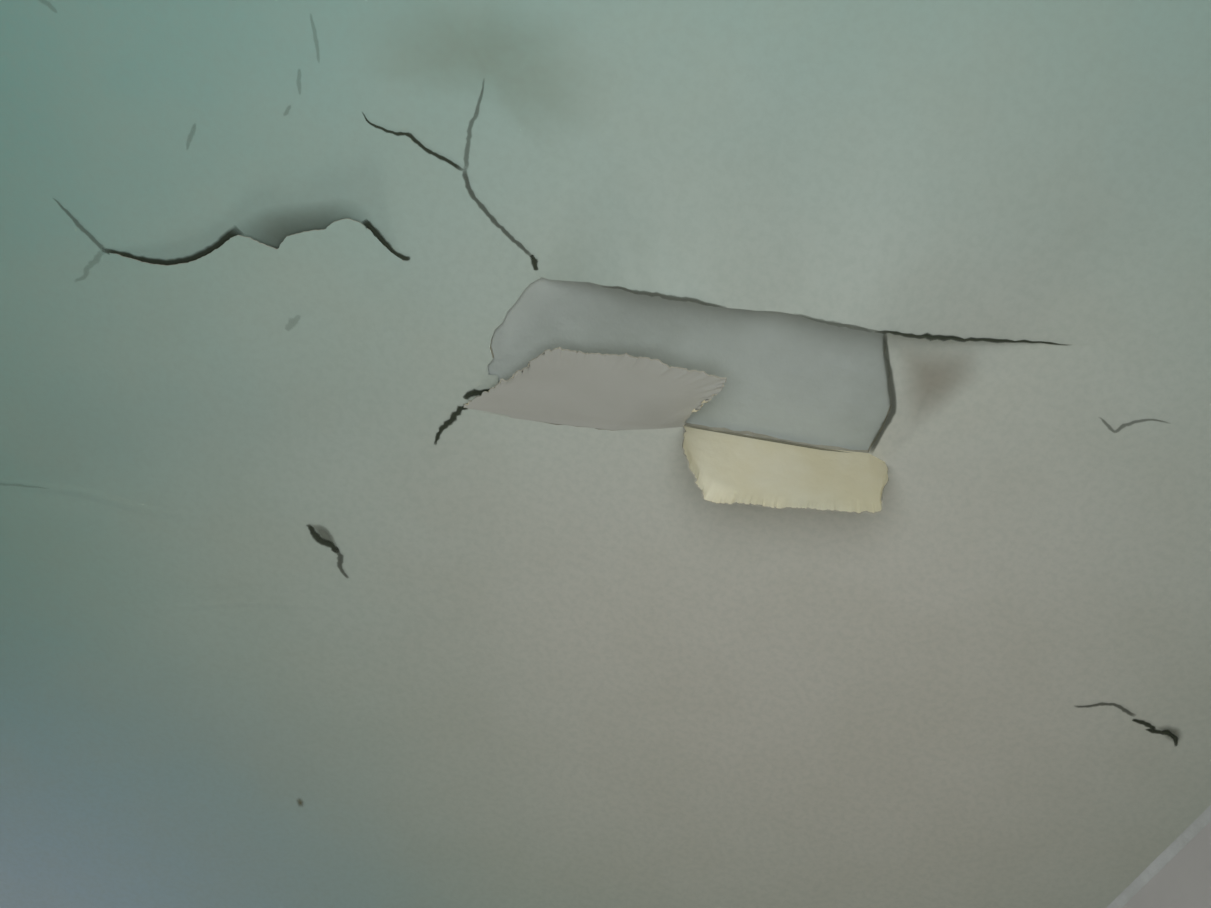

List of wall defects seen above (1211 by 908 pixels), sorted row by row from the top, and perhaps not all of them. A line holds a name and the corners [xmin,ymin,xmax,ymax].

crack [364,115,538,270]
peeling [434,0,1184,514]
crack [1077,703,1178,746]